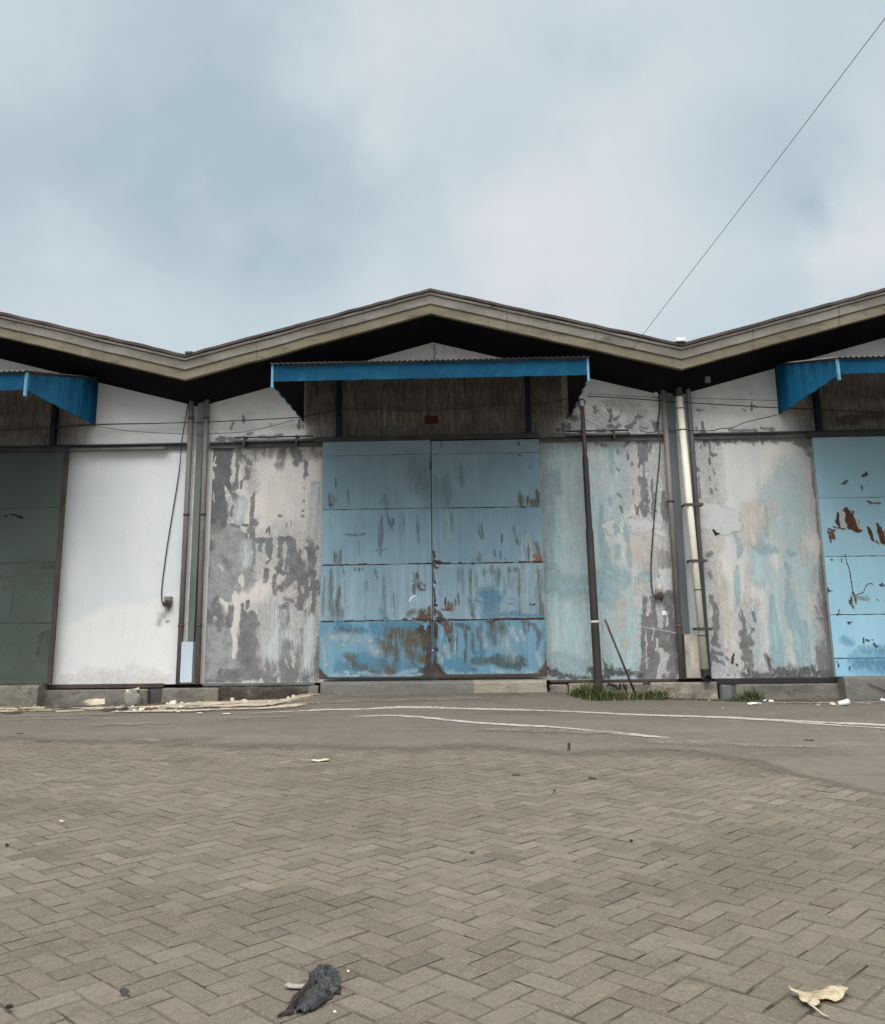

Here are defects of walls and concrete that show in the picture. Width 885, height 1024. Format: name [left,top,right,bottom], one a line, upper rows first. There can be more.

peeling [556,402,668,522]
peeling [695,409,720,498]
peeling [210,415,320,700]
rust [323,546,546,677]
peeling [640,590,679,685]
peeling [709,595,772,672]
crack [841,554,872,604]